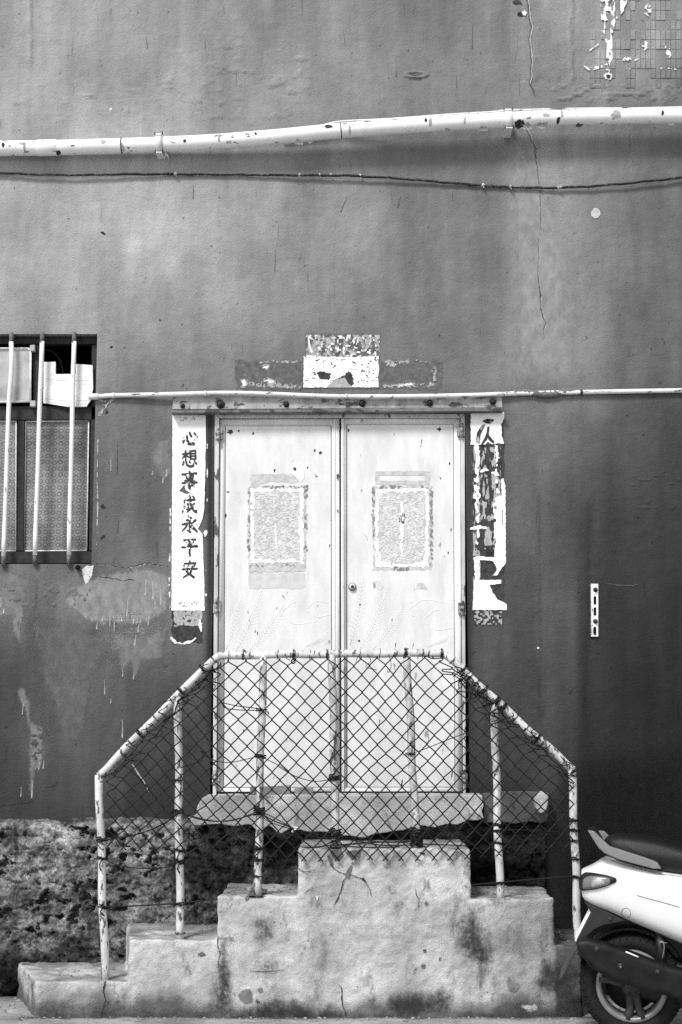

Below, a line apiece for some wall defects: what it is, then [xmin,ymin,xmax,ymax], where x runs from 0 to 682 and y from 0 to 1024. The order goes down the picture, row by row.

crack [526,0,535,95]
peeling [584,0,648,80]
crack [526,129,546,337]
damp [0,569,170,738]
damp [18,690,44,798]
crack [298,856,371,905]